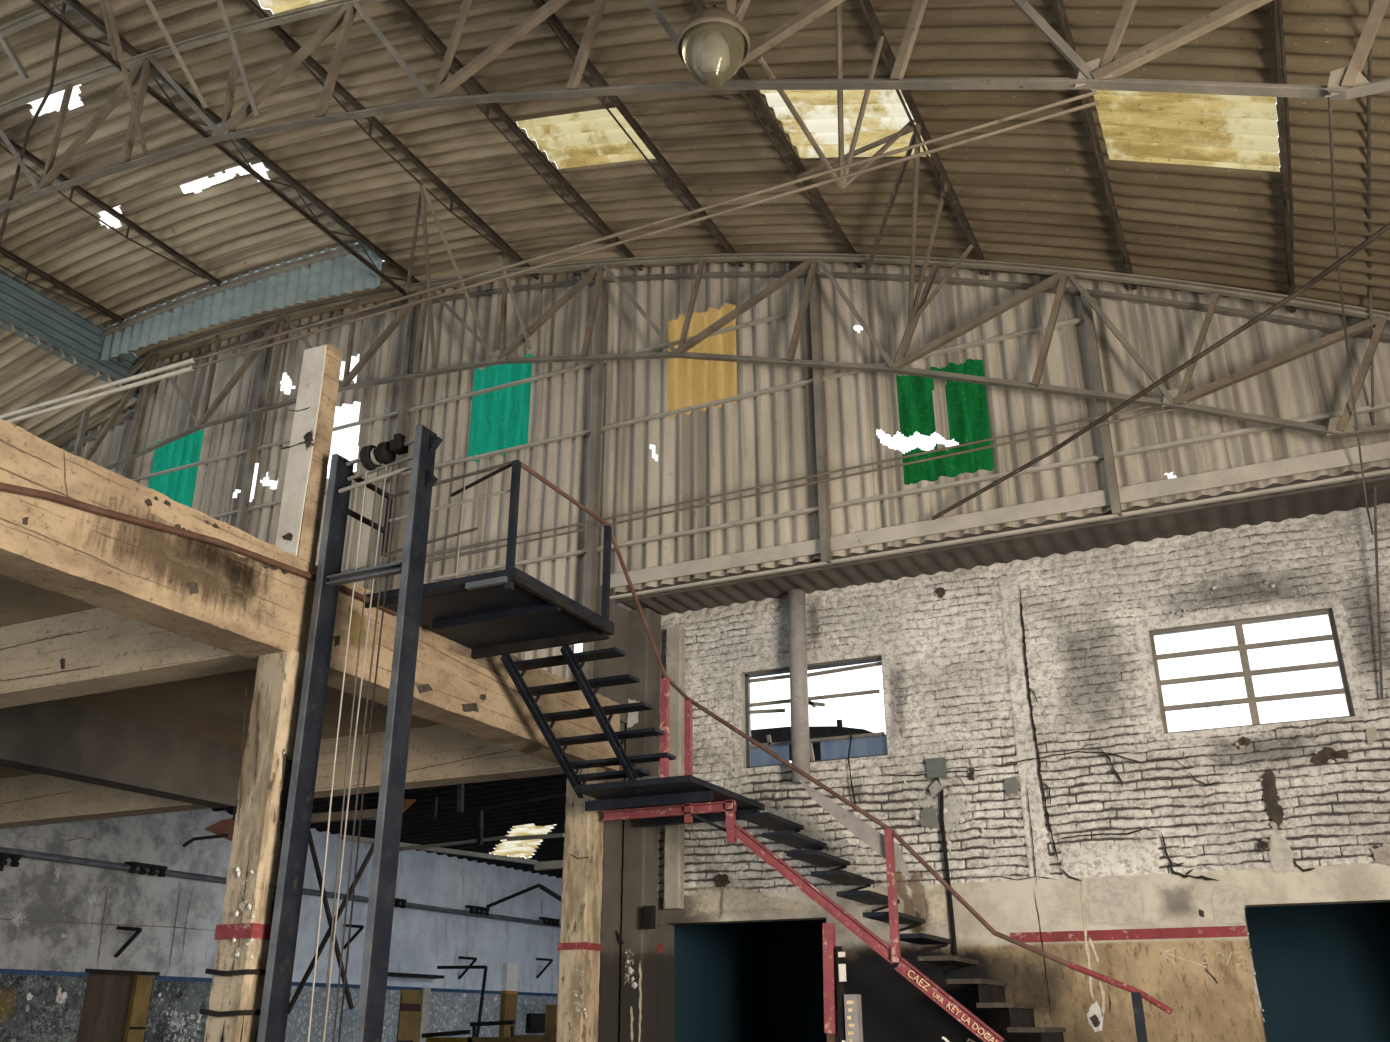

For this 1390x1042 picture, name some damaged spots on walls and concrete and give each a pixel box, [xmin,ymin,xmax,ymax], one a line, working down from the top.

leakage [115,514,260,605]
spalling [1311,746,1353,765]
crack [889,582,1220,1023]
spalling [1257,769,1286,850]